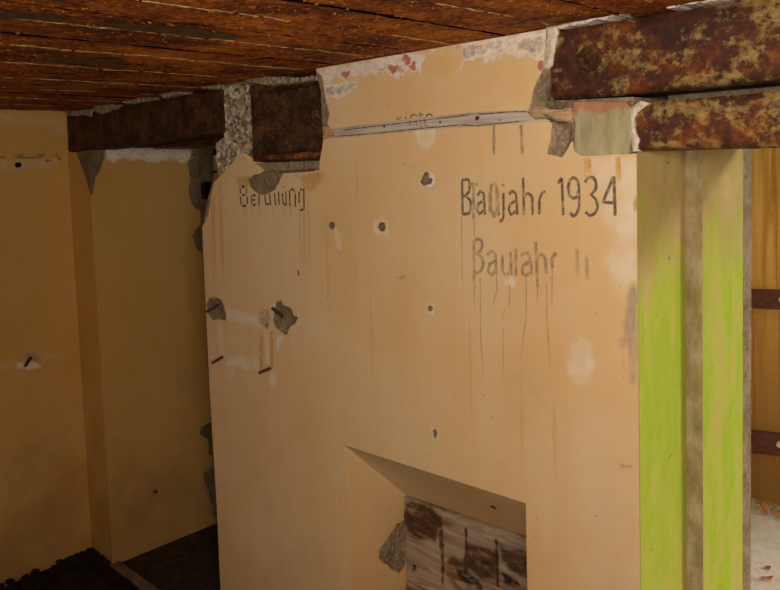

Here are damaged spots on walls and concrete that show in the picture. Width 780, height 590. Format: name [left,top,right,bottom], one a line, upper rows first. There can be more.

rust [0,0,455,93]
flaking render [316,29,578,127]
spalling [215,83,253,178]
spalling [192,223,202,253]
spalling [206,297,226,320]
spalling [273,300,298,335]
spalling [200,422,213,455]
spalling [203,466,216,517]